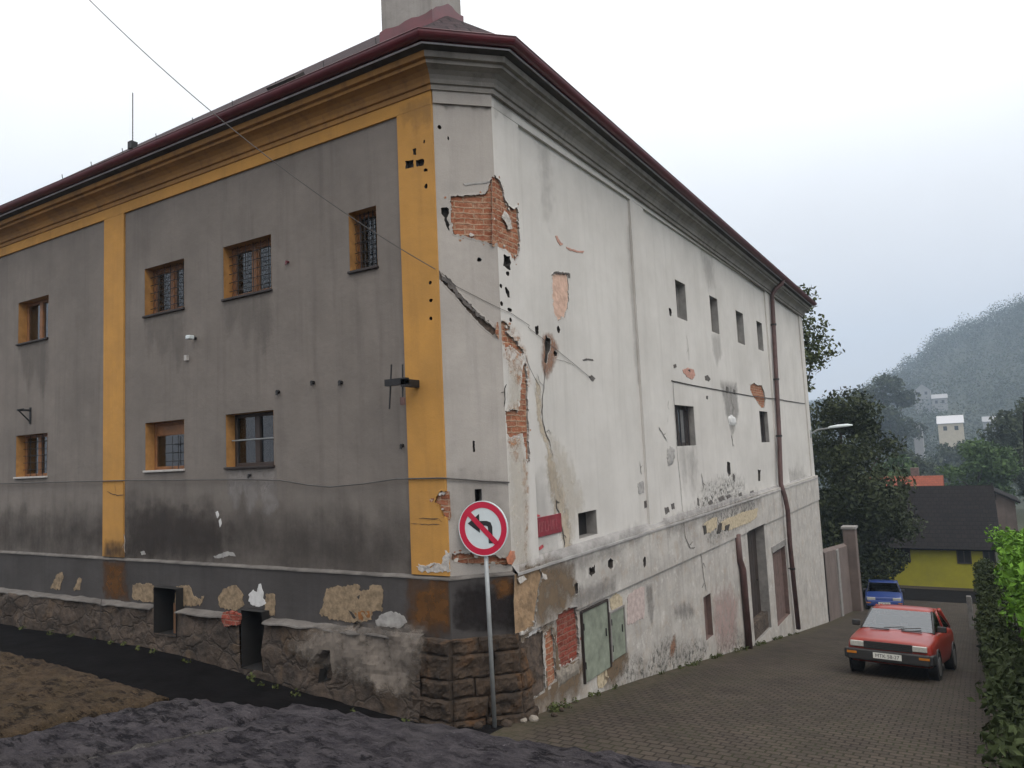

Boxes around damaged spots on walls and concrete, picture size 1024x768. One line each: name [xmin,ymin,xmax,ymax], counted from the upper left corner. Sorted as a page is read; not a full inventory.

flaking render [444,176,521,265]
flaking render [551,270,570,323]
flaking render [441,275,531,466]
crack [526,358,571,452]
flaking render [750,382,766,409]
flaking render [430,488,452,520]
flaking render [132,583,154,602]
flaking render [175,585,204,607]
flaking render [218,584,276,627]
flaking render [319,584,407,628]
flaking render [416,550,581,699]